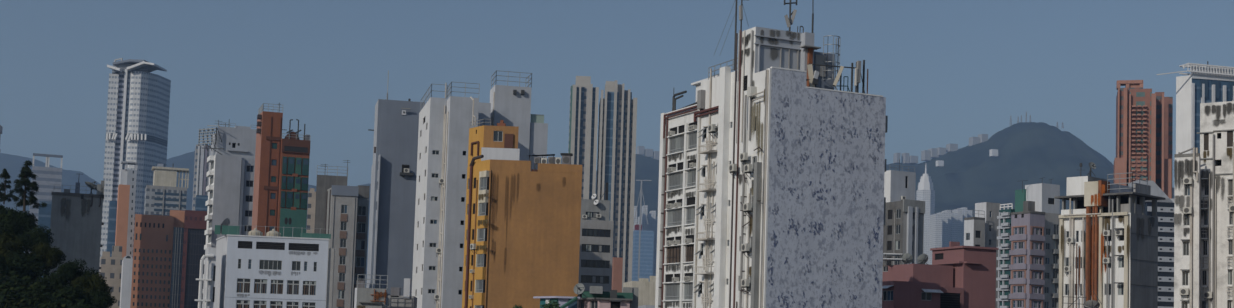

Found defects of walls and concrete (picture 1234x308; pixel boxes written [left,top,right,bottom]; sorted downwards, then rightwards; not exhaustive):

rust [1091,184,1105,206]
rust [1078,223,1107,292]